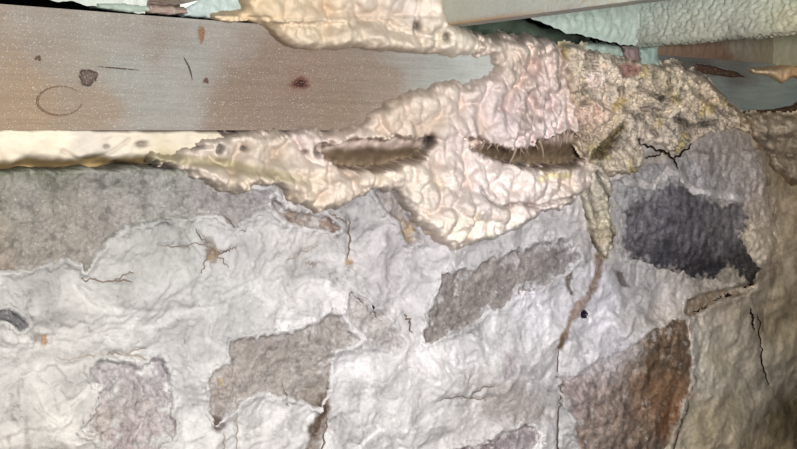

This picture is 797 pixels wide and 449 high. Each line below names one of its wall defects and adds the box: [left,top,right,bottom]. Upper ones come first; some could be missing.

crack [639,143,692,168]
crack [692,284,769,386]